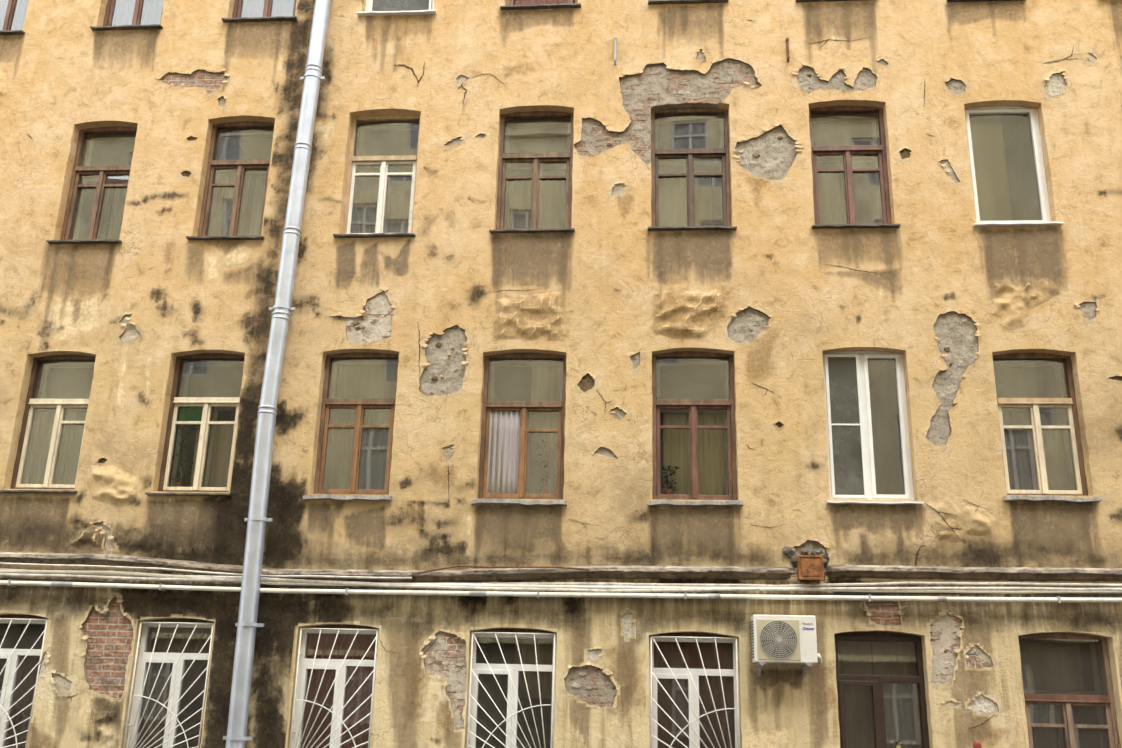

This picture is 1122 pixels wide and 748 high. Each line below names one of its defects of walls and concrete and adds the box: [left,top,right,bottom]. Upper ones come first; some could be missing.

crack [395,62,425,87]
flaking render [574,43,762,165]
flaking render [790,56,890,93]
flaking render [732,122,804,184]
leakage [0,0,319,748]
flaking render [418,323,472,402]
flaking render [923,306,982,451]
leakage [247,465,566,748]
leakage [607,506,765,565]
leakage [658,579,739,593]
leakage [827,501,1104,596]
flaking render [560,645,622,713]